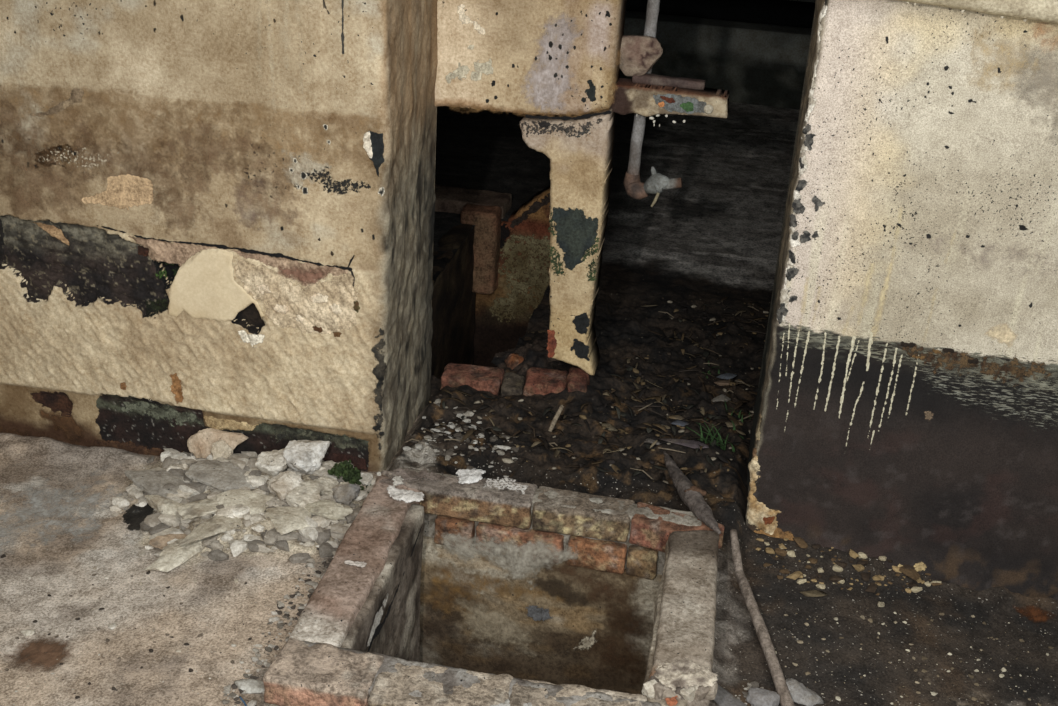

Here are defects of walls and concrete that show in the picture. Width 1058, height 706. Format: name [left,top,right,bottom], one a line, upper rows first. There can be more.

leakage [0,87,385,226]
peeling [363,131,384,177]
peeling [776,0,827,325]
flaking render [0,215,360,347]
crack [97,225,355,286]
peeling [204,415,259,431]
flaking render [746,414,794,541]
leakage [776,323,810,432]
leakage [814,332,840,411]
leakage [846,264,903,446]
spalling [234,467,725,706]